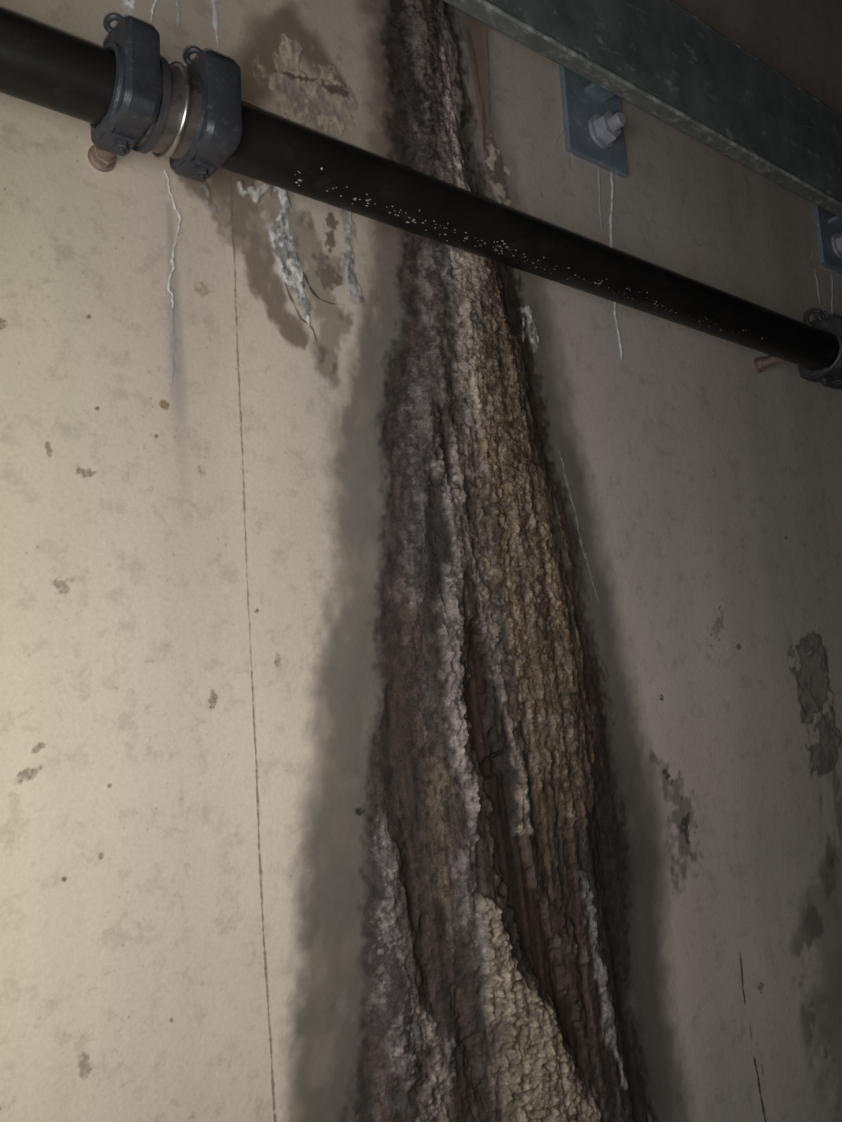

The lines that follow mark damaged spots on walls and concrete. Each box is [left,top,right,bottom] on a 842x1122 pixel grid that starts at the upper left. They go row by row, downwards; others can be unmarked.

damp [240,9,357,137]
damp [373,0,498,203]
damp [164,167,682,1122]
peeling [788,633,842,775]
spalling [678,813,695,843]
crack [738,956,746,1003]
crack [750,1033,766,1122]